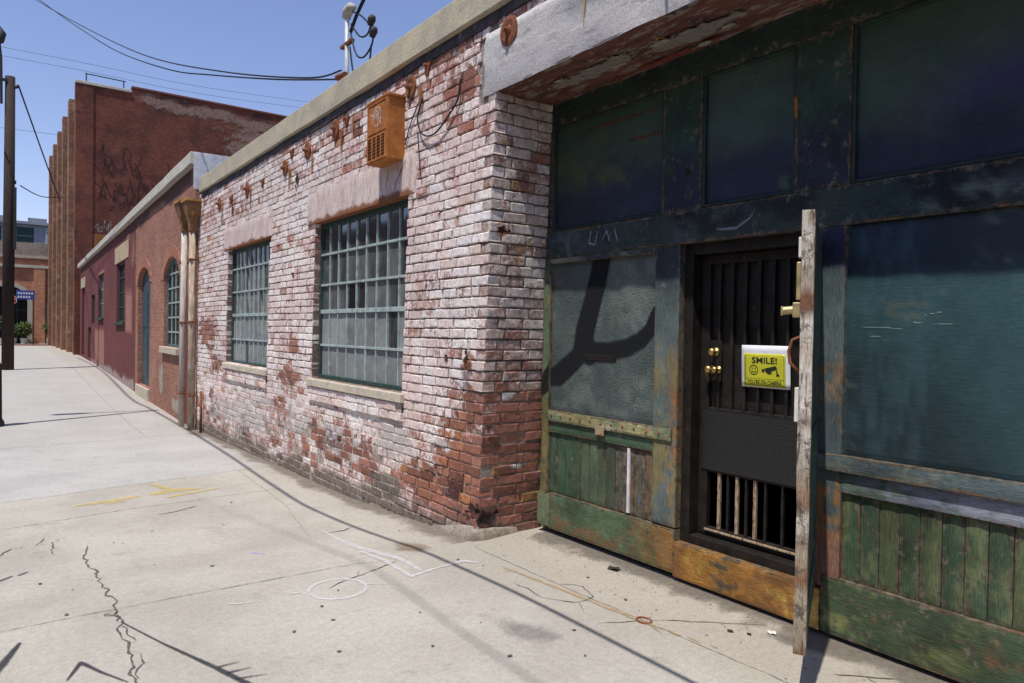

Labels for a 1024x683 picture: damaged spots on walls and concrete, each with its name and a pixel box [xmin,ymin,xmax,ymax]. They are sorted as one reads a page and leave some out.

peeling [541,11,749,90]
peeling [199,315,222,373]
peeling [272,331,304,413]
peeling [308,415,381,488]
peeling [400,380,541,529]
crack [82,546,145,683]